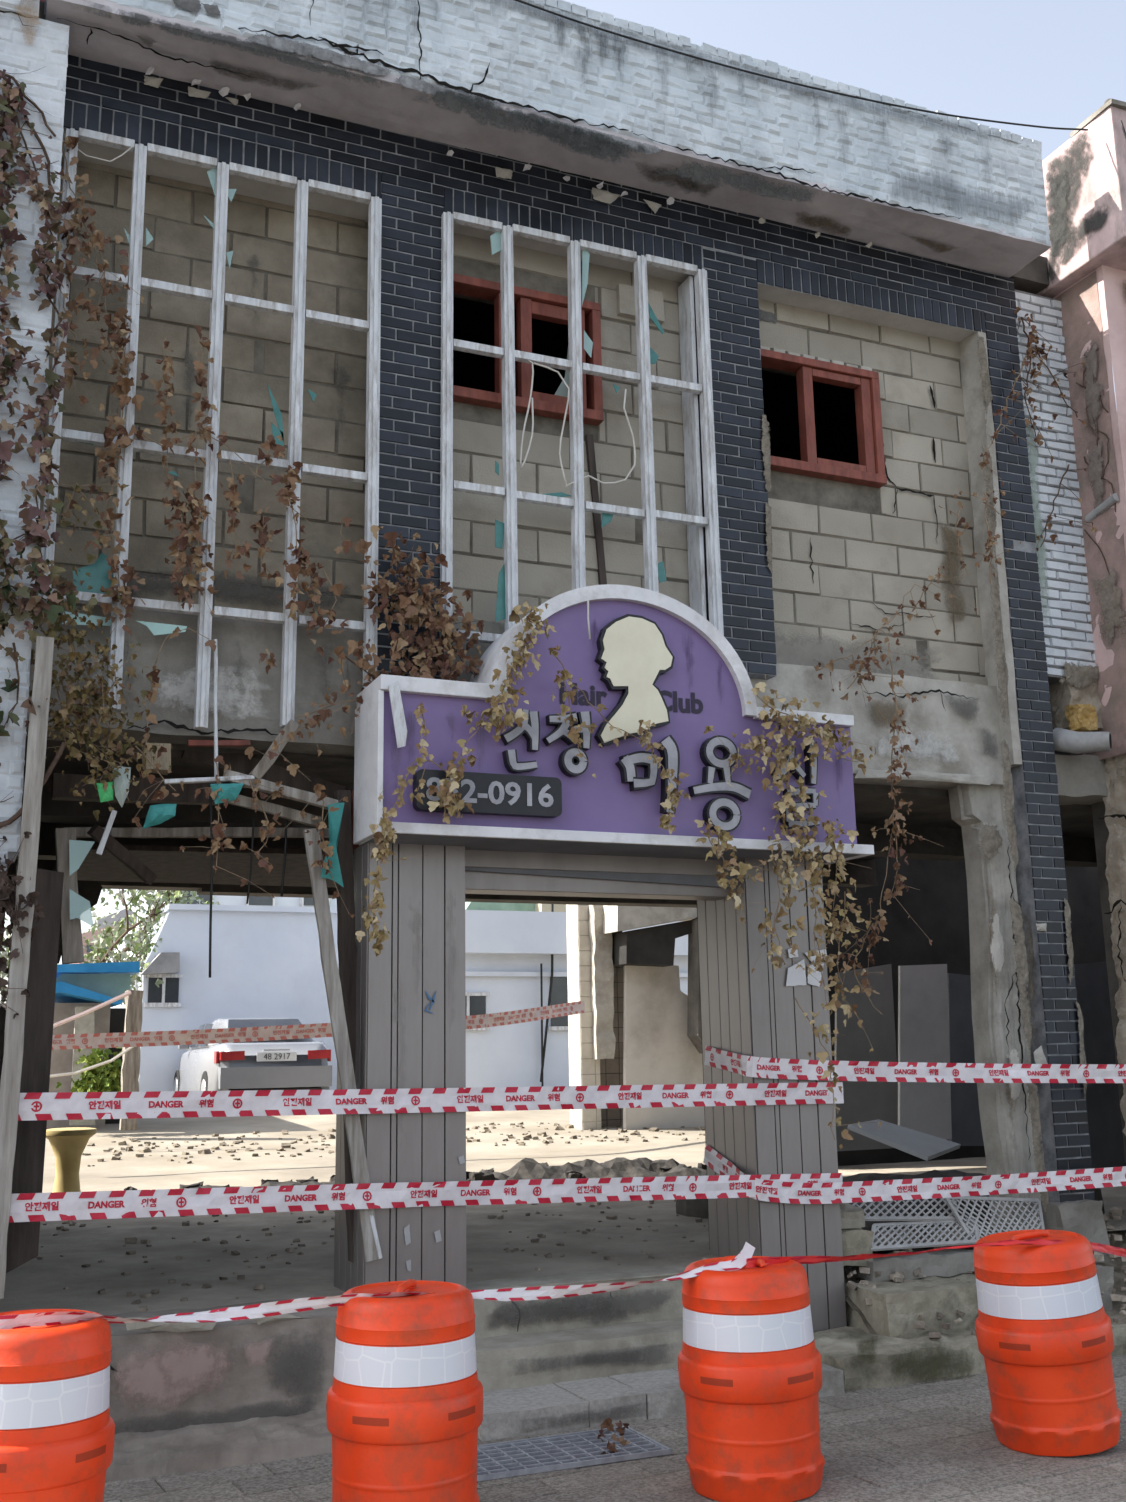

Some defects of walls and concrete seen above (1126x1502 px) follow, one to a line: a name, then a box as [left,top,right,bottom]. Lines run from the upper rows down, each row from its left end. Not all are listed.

crack [0,10,253,78]
crack [238,0,960,219]
leakage [419,90,850,234]
leakage [912,237,953,252]
mould [1045,132,1107,282]
crack [864,689,976,711]
crack [1099,813,1126,821]
crack [1104,899,1126,981]